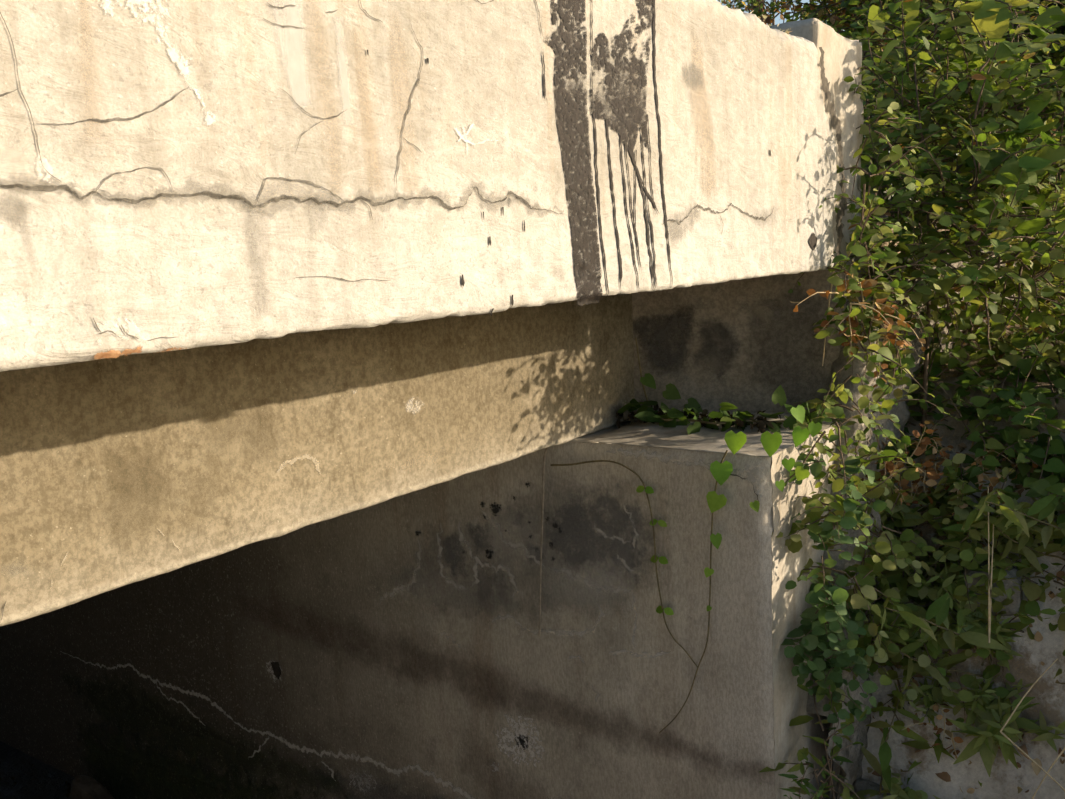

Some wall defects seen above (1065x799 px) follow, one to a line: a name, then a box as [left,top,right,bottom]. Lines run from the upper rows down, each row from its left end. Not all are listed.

peeling [101,0,191,77]
crack [263,3,305,29]
crack [0,12,562,220]
leakage [543,0,602,306]
crack [663,203,774,234]
leakage [633,307,736,374]